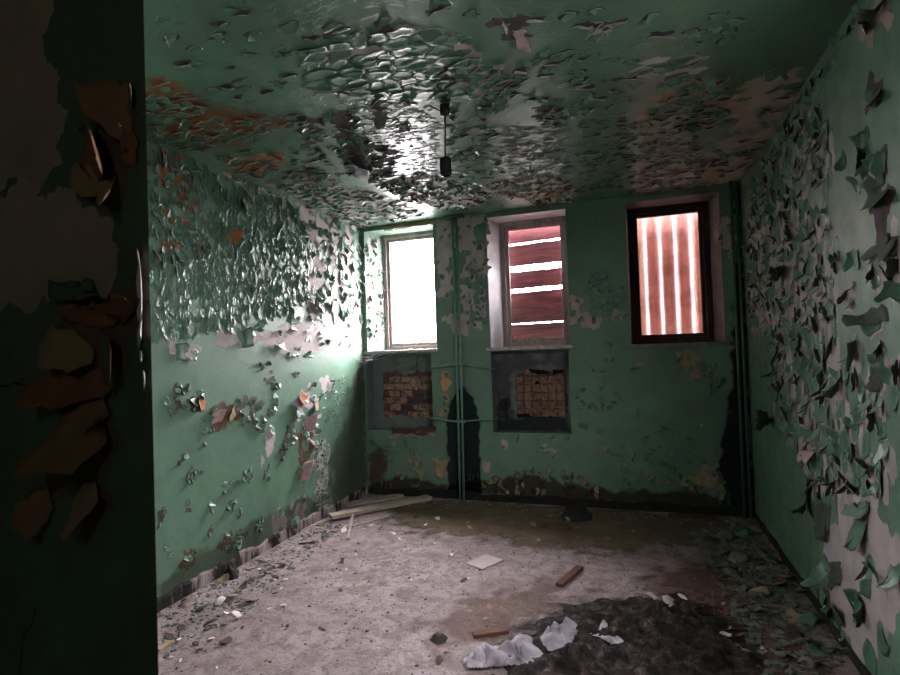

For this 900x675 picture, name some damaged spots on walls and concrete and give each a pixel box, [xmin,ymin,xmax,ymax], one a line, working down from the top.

peeling [855,0,894,49]
spalling [0,0,150,414]
peeling [146,7,633,364]
spalling [383,370,452,418]
spalling [515,367,568,418]
spalling [596,55,900,675]
spalling [164,360,350,554]
leakage [369,475,732,557]
peeling [163,544,198,571]